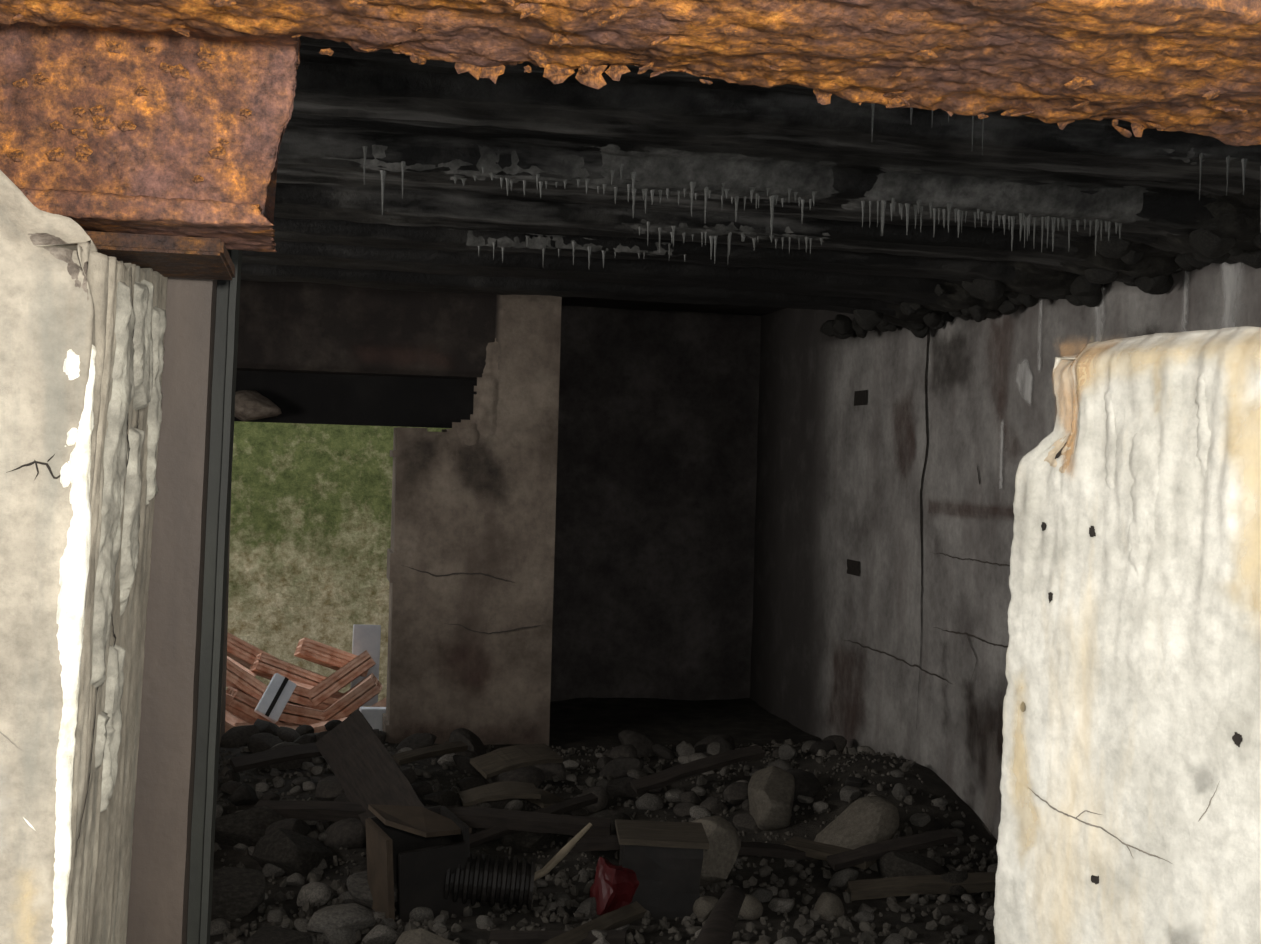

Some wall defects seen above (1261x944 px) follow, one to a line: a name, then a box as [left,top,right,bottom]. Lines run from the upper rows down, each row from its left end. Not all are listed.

rust [454,62,505,84]
rust [524,33,668,89]
rust [813,89,832,105]
rust [1112,119,1165,138]
spalling [820,188,1261,339]
spalling [452,338,501,448]
crack [6,454,61,479]
spalling [1044,431,1075,473]
crack [846,333,1010,728]
damp [51,345,97,944]
damp [970,702,1027,799]
crack [1013,780,1172,864]